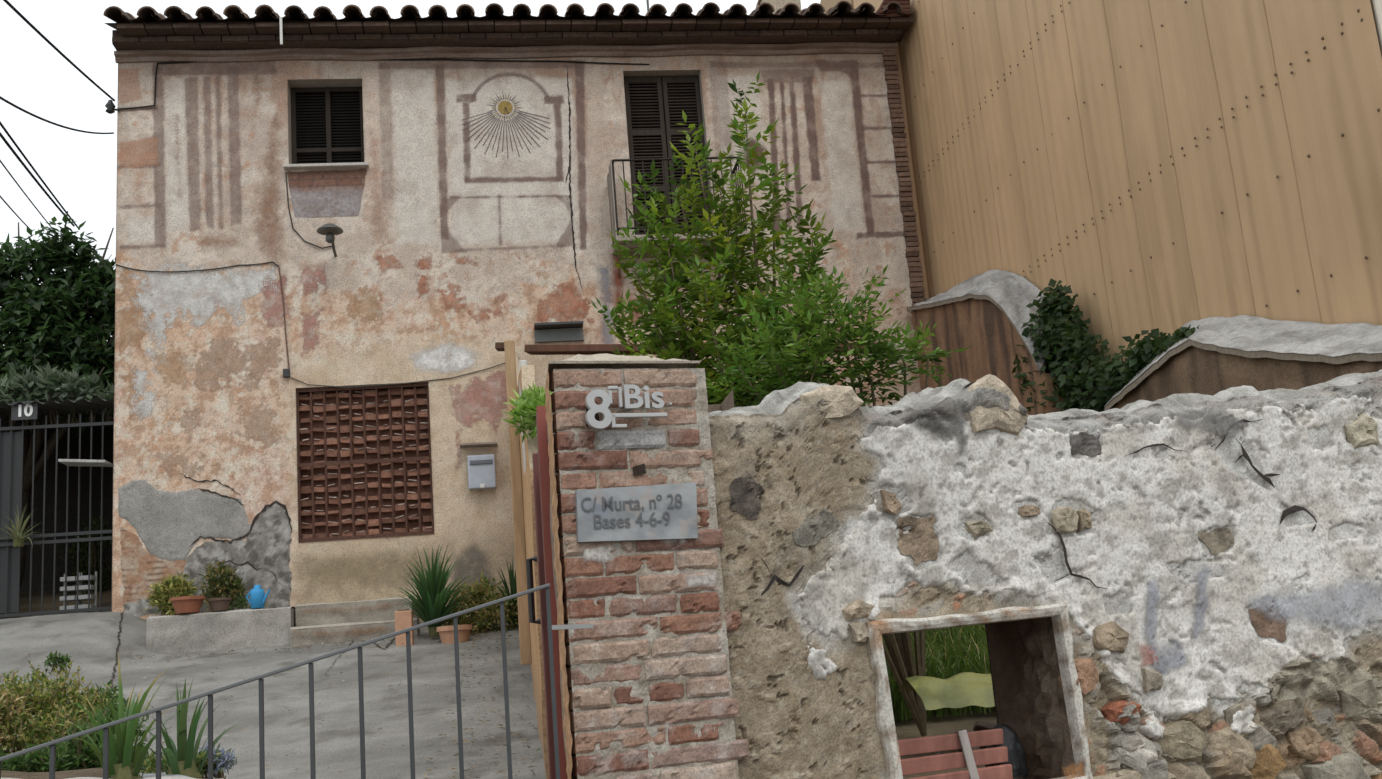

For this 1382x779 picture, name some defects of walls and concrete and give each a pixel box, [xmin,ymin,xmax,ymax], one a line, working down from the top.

spalling [120,502,292,617]
peeling [791,395,1382,741]